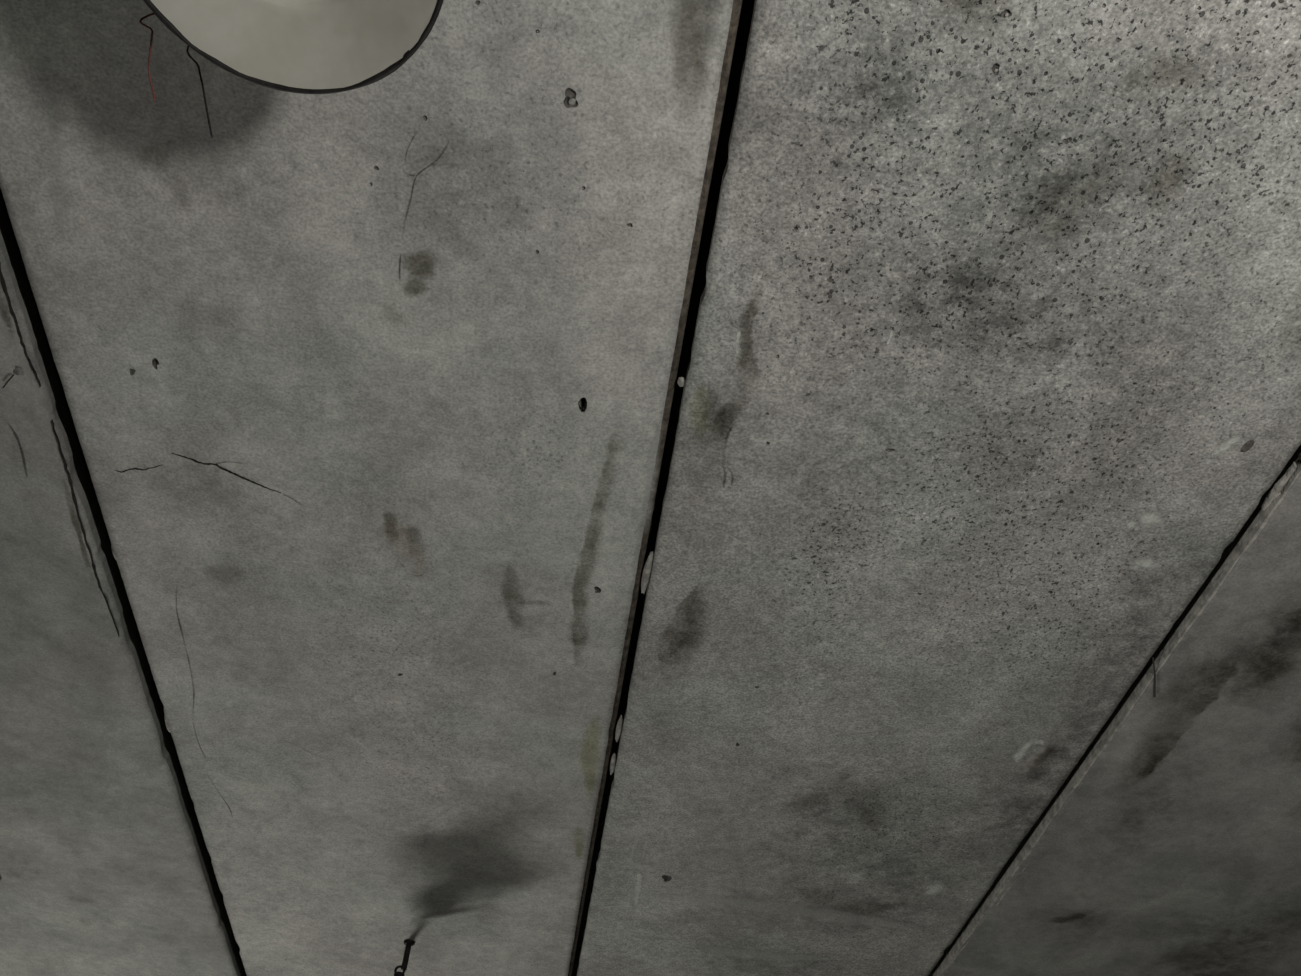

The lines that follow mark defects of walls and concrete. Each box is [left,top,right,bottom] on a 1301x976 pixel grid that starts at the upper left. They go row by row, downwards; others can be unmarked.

crack [115,453,281,493]